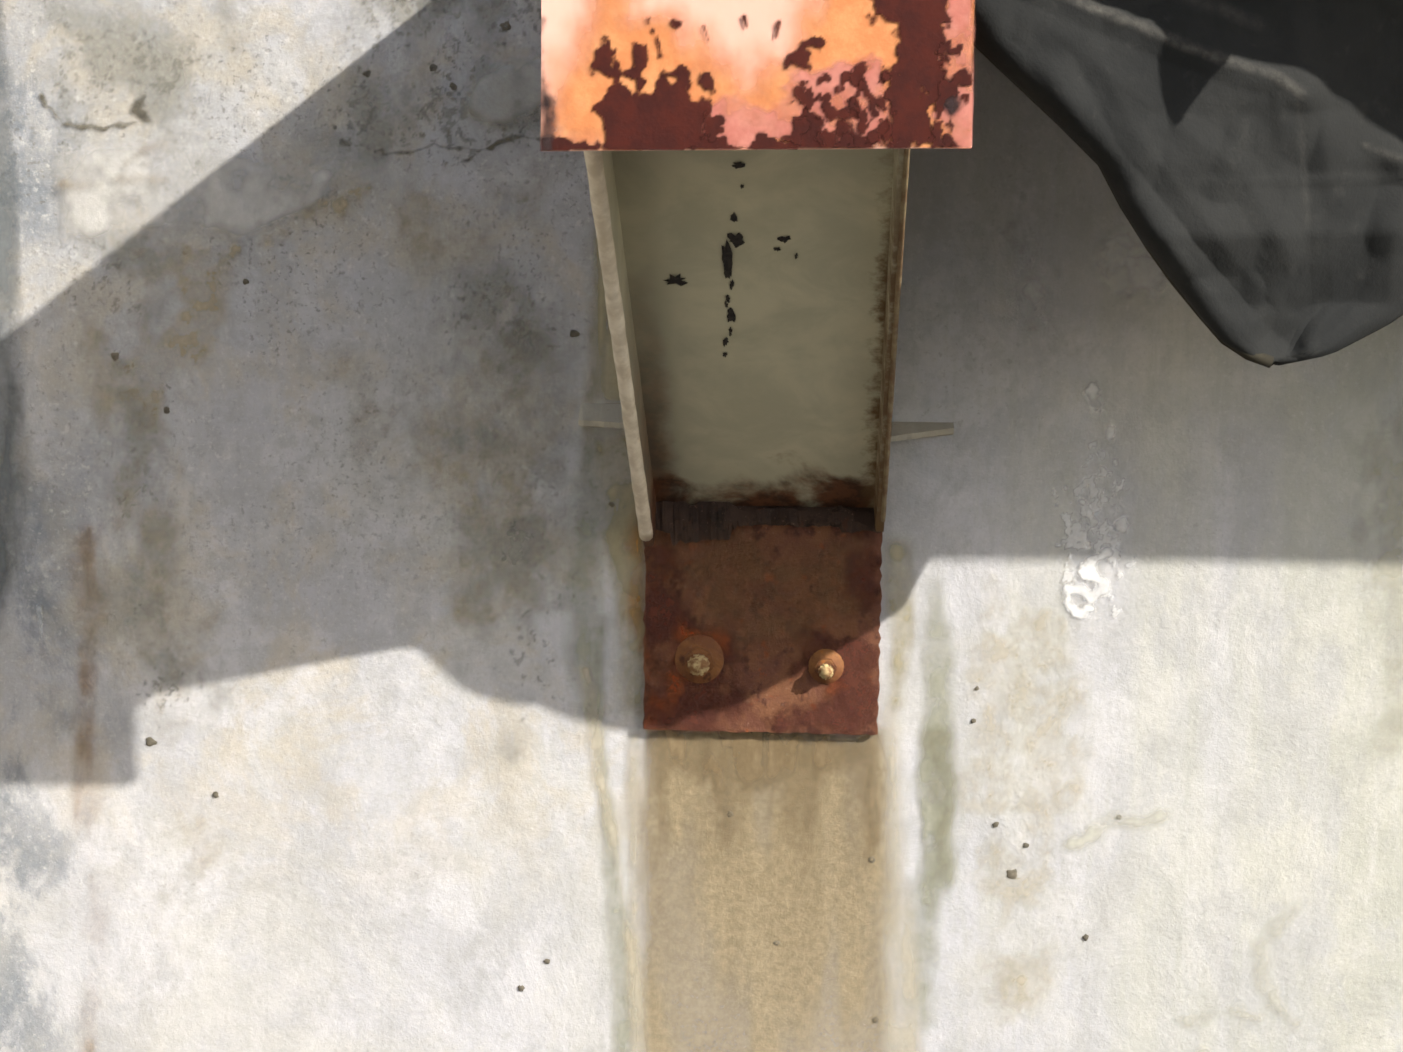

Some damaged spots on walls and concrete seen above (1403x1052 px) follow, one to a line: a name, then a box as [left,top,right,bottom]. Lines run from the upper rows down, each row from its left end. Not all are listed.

crack [39,94,149,131]
crack [340,136,541,162]
corrosion [541,0,973,189]
corrosion [596,238,620,401]
corrosion [664,273,688,286]
corrosion [722,213,745,357]
corrosion [773,236,798,259]
leakage [1053,427,1135,630]
corrosion [605,482,742,731]
corrosion [773,633,878,734]